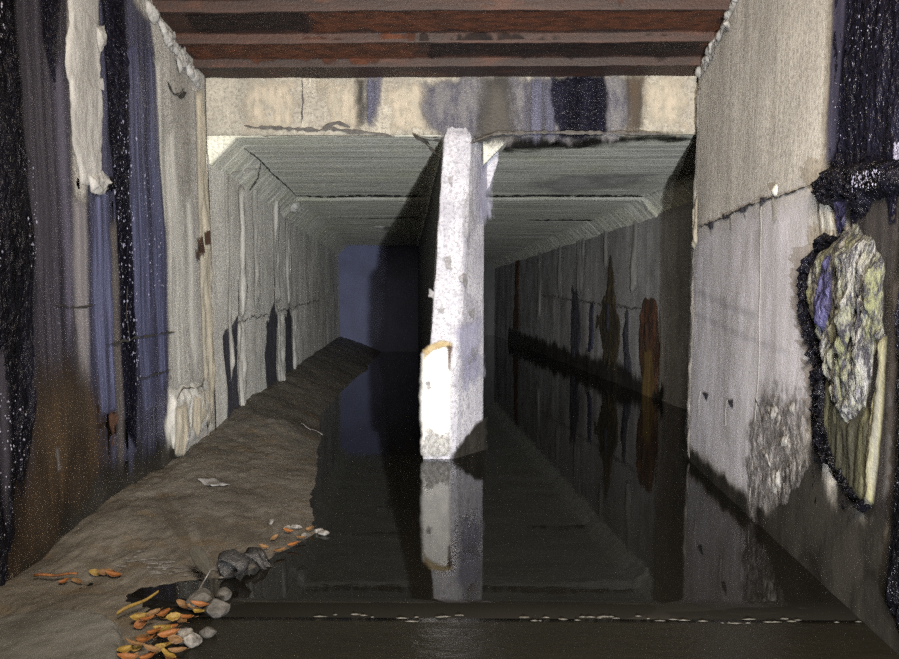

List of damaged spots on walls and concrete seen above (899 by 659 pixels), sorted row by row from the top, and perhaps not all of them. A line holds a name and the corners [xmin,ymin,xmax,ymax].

corrosion [183,11,725,65]
water stain [421,75,687,152]
water stain [827,0,899,169]
water stain [0,0,216,586]
spalling [746,385,812,522]
water stain [684,193,899,655]
spalling [806,224,886,499]